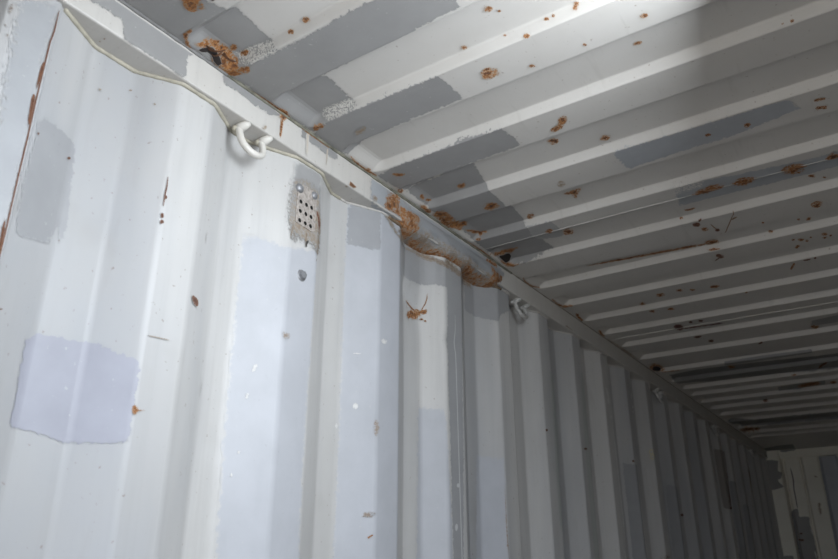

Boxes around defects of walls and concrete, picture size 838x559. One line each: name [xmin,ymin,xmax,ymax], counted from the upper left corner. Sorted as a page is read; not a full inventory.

corrosion [181,0,205,12]
corrosion [183,30,250,76]
corrosion [480,67,500,80]
corrosion [254,92,290,138]
corrosion [547,116,568,145]
corrosion [781,164,825,178]
corrosion [692,176,755,196]
corrosion [372,189,472,289]
corrosion [420,194,518,268]
corrosion [586,218,724,266]
corrosion [406,297,428,322]